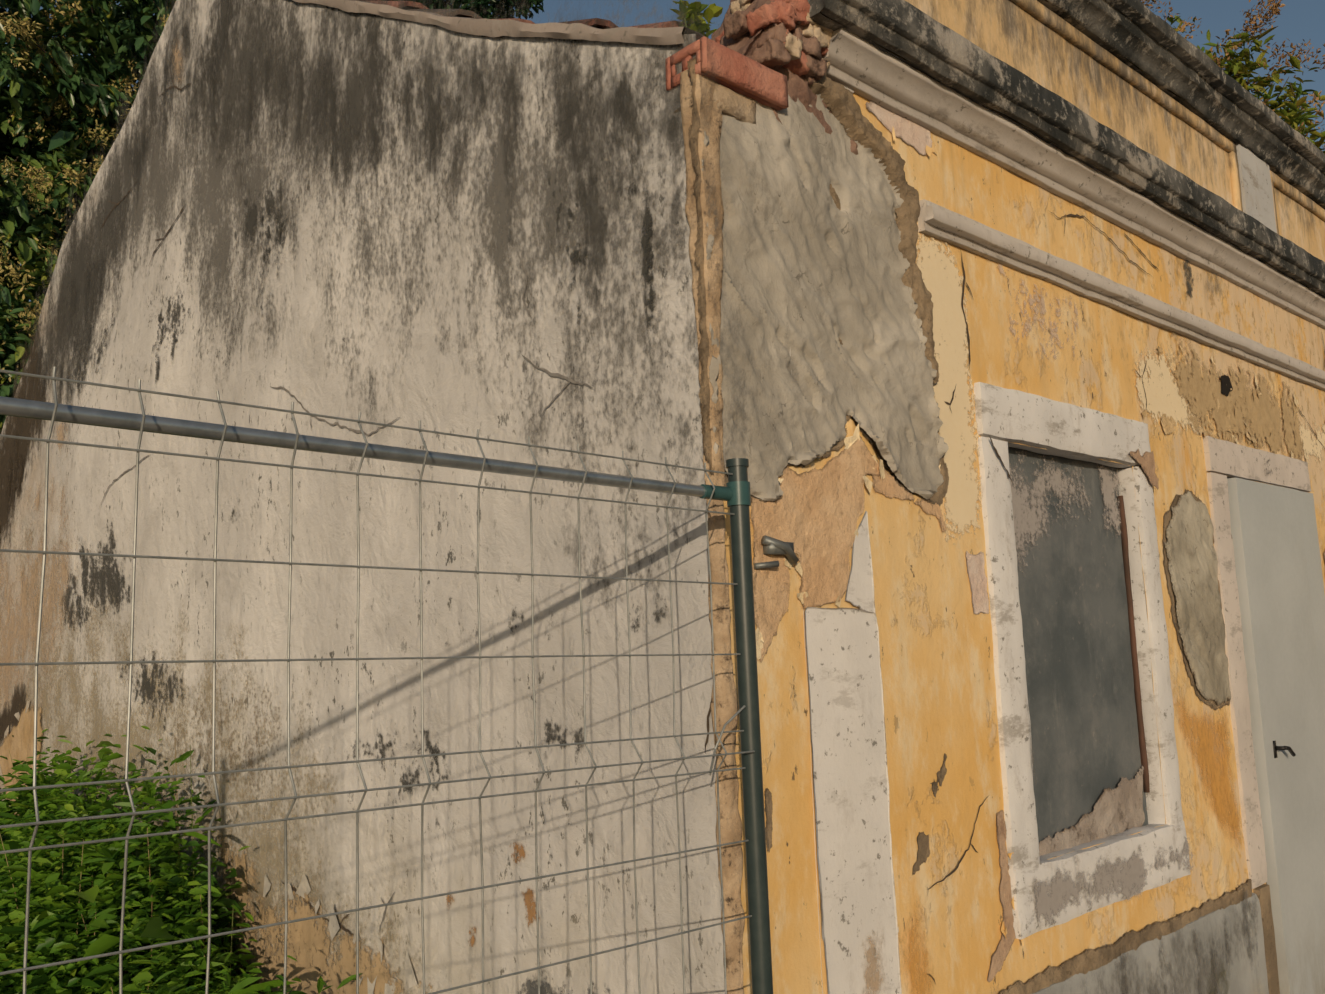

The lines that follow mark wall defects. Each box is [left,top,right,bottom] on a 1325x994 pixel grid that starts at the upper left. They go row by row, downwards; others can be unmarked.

water stain [14,0,700,459]
water stain [1183,260,1219,297]
flaking render [0,700,43,816]
water stain [0,415,395,964]
crack [272,386,400,436]
water stain [347,730,448,821]
water stain [545,721,584,752]
spalling [680,57,745,994]
peeling [711,0,982,994]
flaking render [1163,489,1230,710]
peeling [1135,331,1325,463]
flaking render [987,810,1252,994]